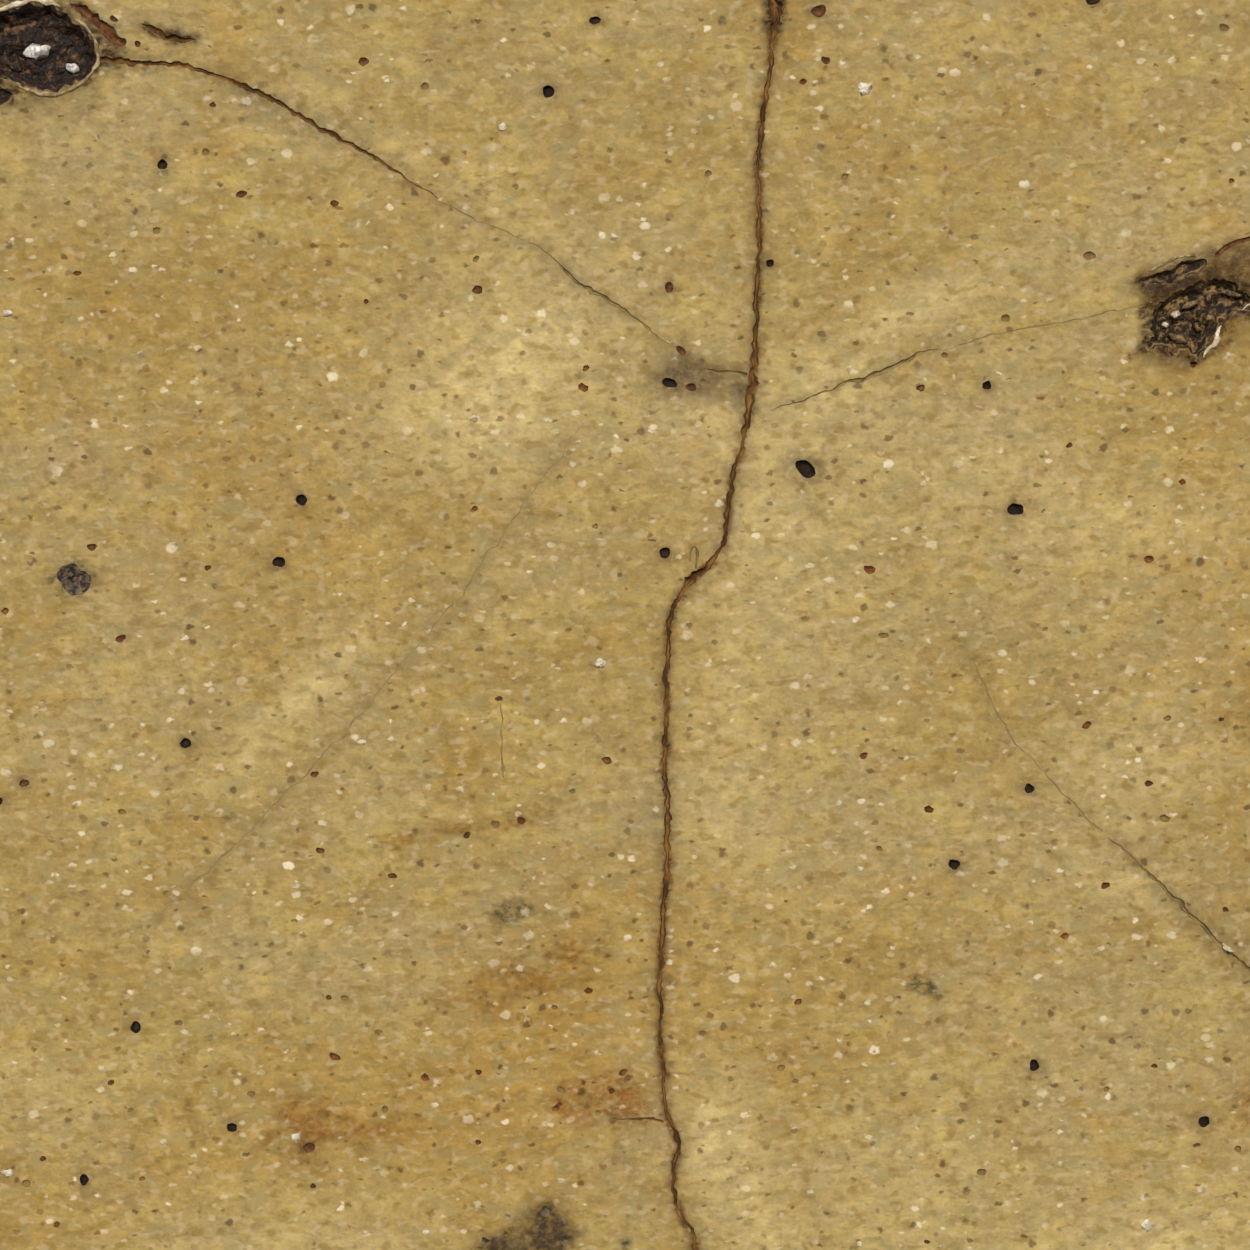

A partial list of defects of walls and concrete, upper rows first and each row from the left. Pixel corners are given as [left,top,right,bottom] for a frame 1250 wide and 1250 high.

spalling [0,0,141,105]
crack [100,23,668,343]
spalling [1134,232,1250,368]
crack [153,423,584,920]
crack [613,0,1145,1250]
crack [964,644,1250,972]
damp [488,1205,573,1250]